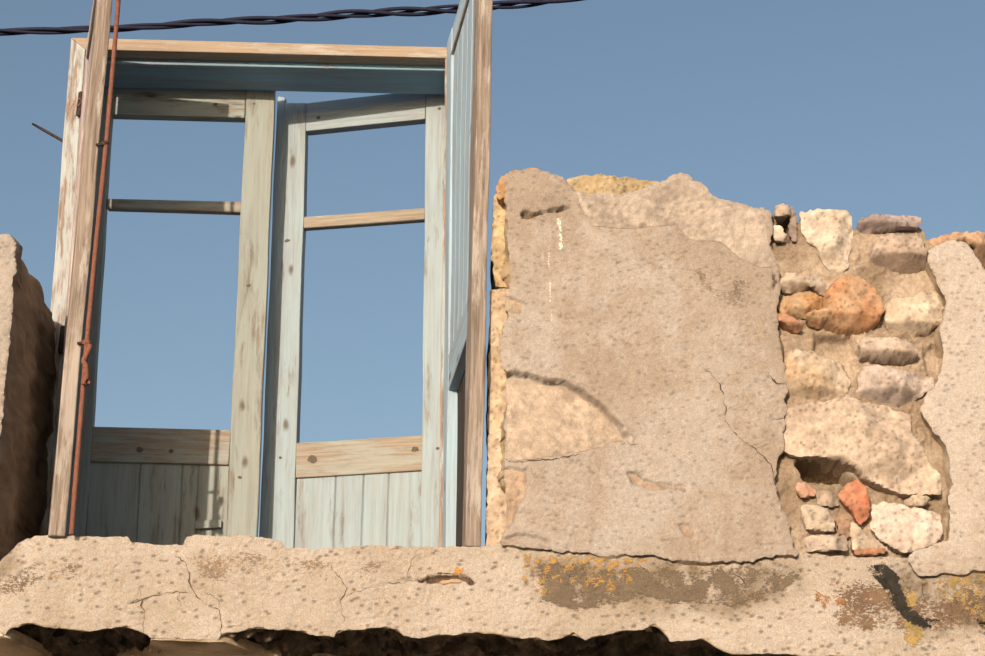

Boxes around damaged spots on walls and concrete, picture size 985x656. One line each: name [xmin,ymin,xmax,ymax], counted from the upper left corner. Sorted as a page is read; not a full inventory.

flaking render [504,378,637,525]
crack [130,557,241,638]
hole [418,572,475,586]
water stain [855,564,985,648]